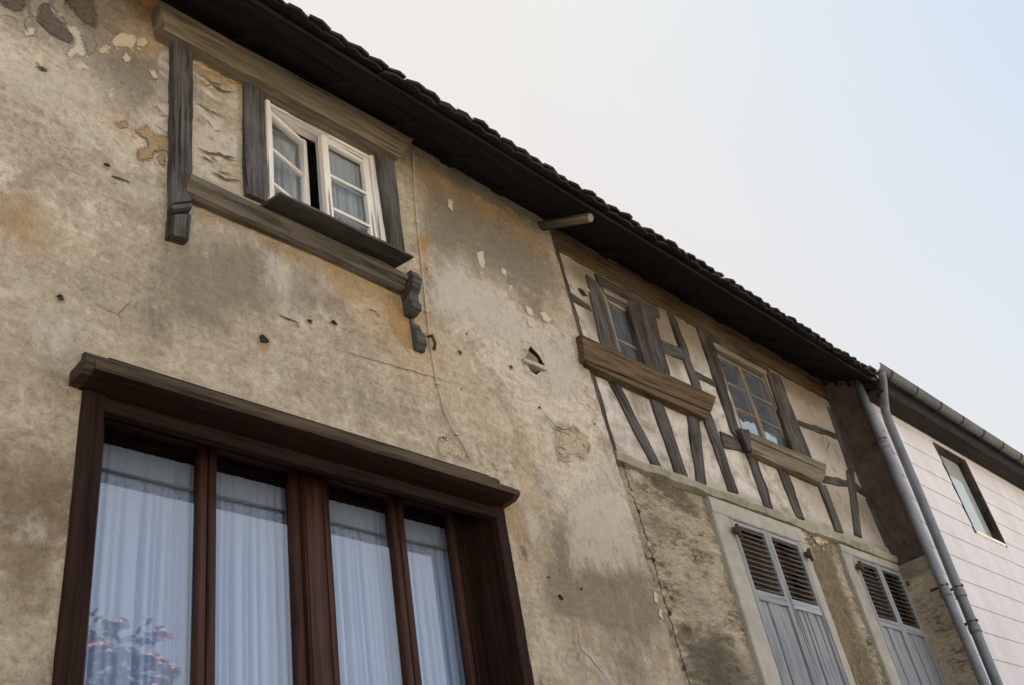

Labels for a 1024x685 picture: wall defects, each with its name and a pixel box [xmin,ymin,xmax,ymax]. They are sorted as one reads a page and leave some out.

peeling [0,0,148,70]
peeling [115,121,168,167]
peeling [477,251,513,292]
spalling [554,423,591,460]
crack [620,461,691,685]